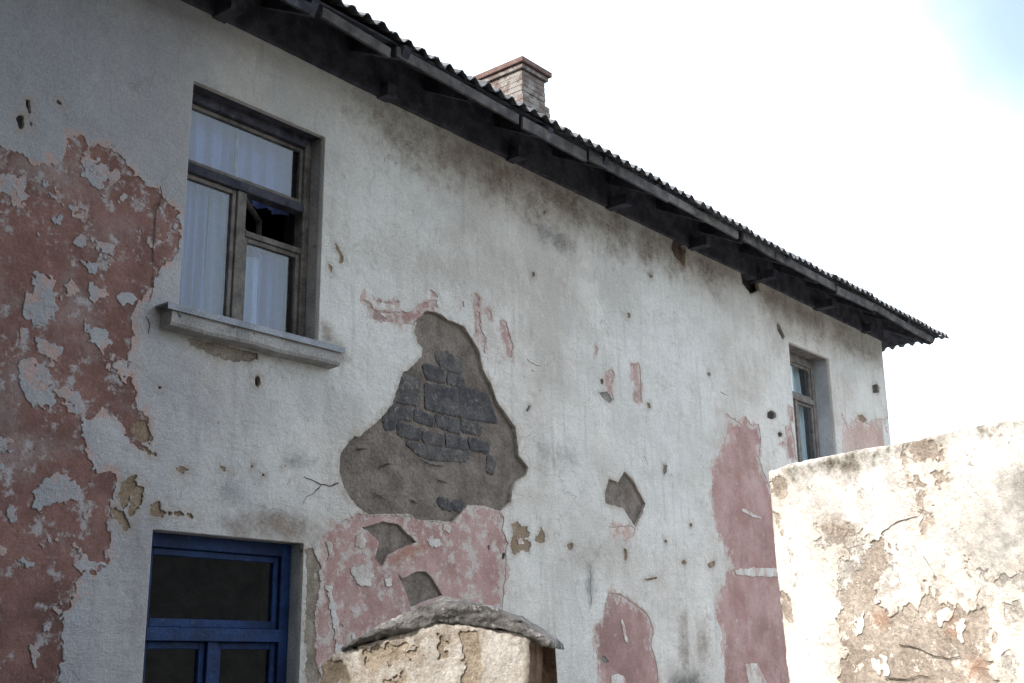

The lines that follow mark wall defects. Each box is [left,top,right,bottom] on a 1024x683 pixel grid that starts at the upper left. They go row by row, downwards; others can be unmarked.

peeling [0,135,192,683]
peeling [842,415,888,453]
crack [304,476,339,501]
spalling [301,290,544,683]
spalling [605,473,643,560]
peeling [711,411,794,683]
peeling [901,438,951,535]
peeling [593,593,658,683]
peeling [814,523,1024,683]